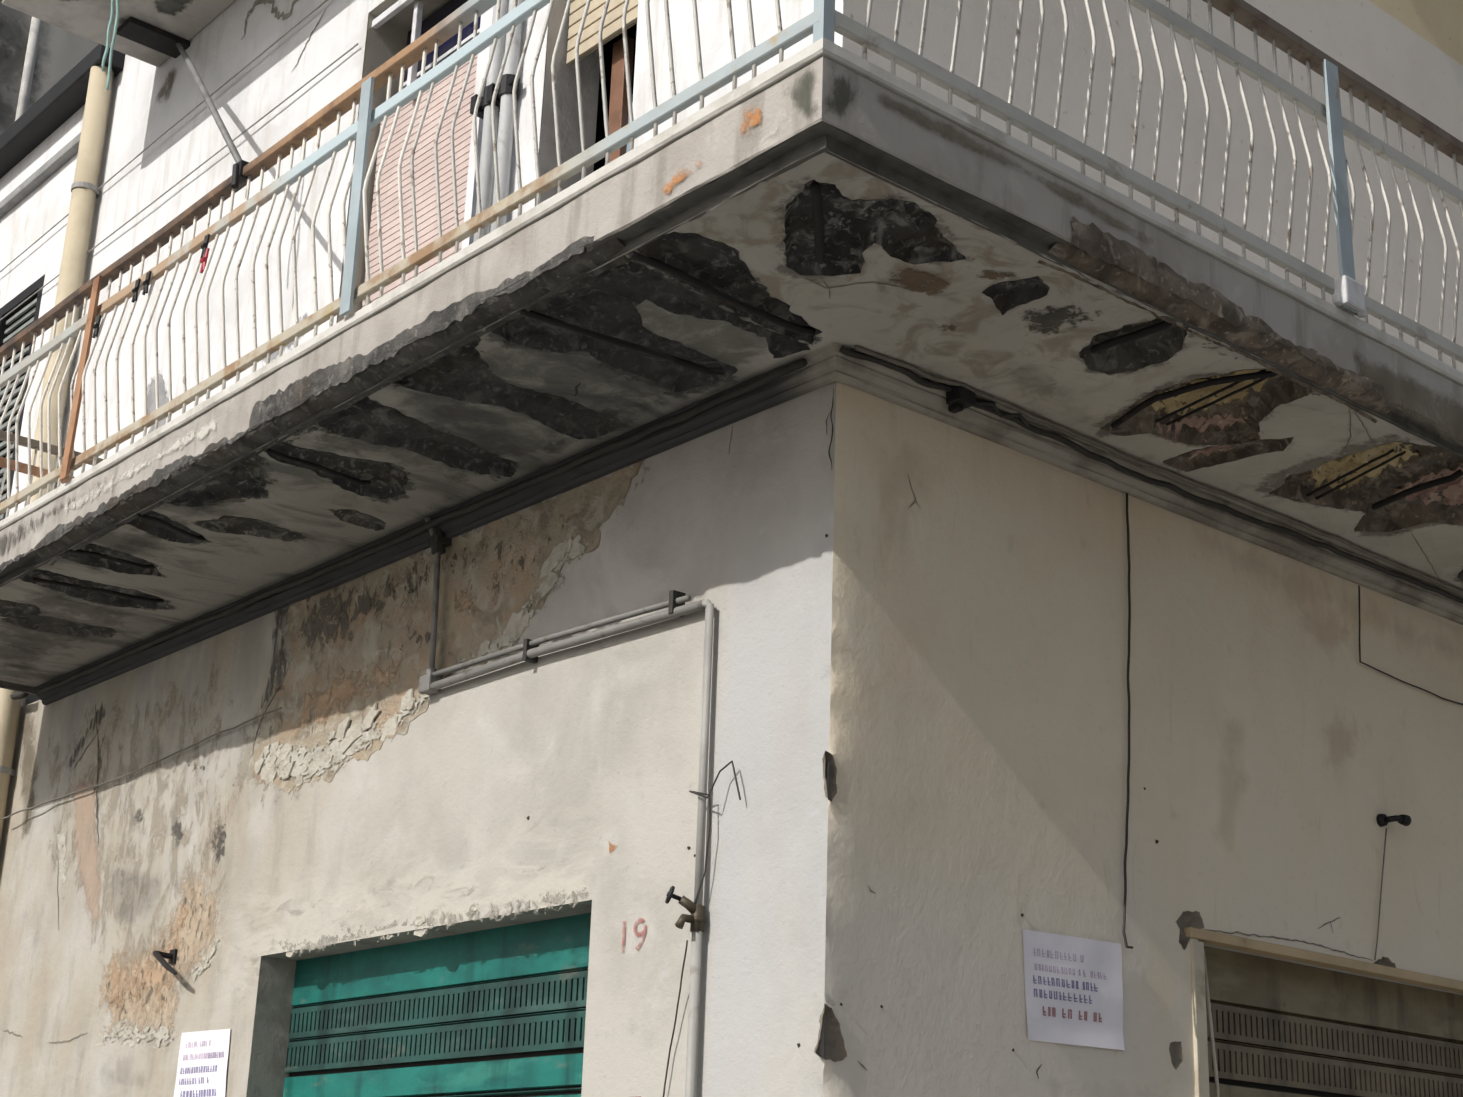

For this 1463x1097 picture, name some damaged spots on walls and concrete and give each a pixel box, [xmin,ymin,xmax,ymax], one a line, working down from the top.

spalling [776,178,974,281]
spalling [0,232,822,610]
spalling [982,216,1463,536]
spalling [0,599,116,638]
flaking render [233,459,645,799]
damp [22,715,36,834]
damp [69,704,105,817]
flaking render [52,672,222,1048]
damp [171,818,183,846]
mould [211,824,226,868]
spalling [822,751,838,801]
spalling [797,995,847,1062]